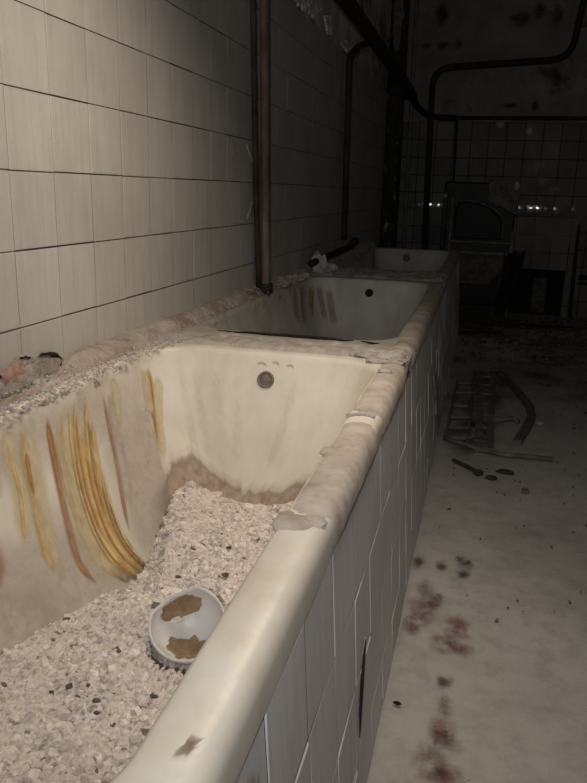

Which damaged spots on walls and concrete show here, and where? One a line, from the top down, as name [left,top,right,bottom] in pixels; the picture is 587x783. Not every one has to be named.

spalling [0,352,64,399]
rust [142,370,164,452]
rust [3,434,60,567]
rust [47,381,145,579]
peeling [175,737,201,755]